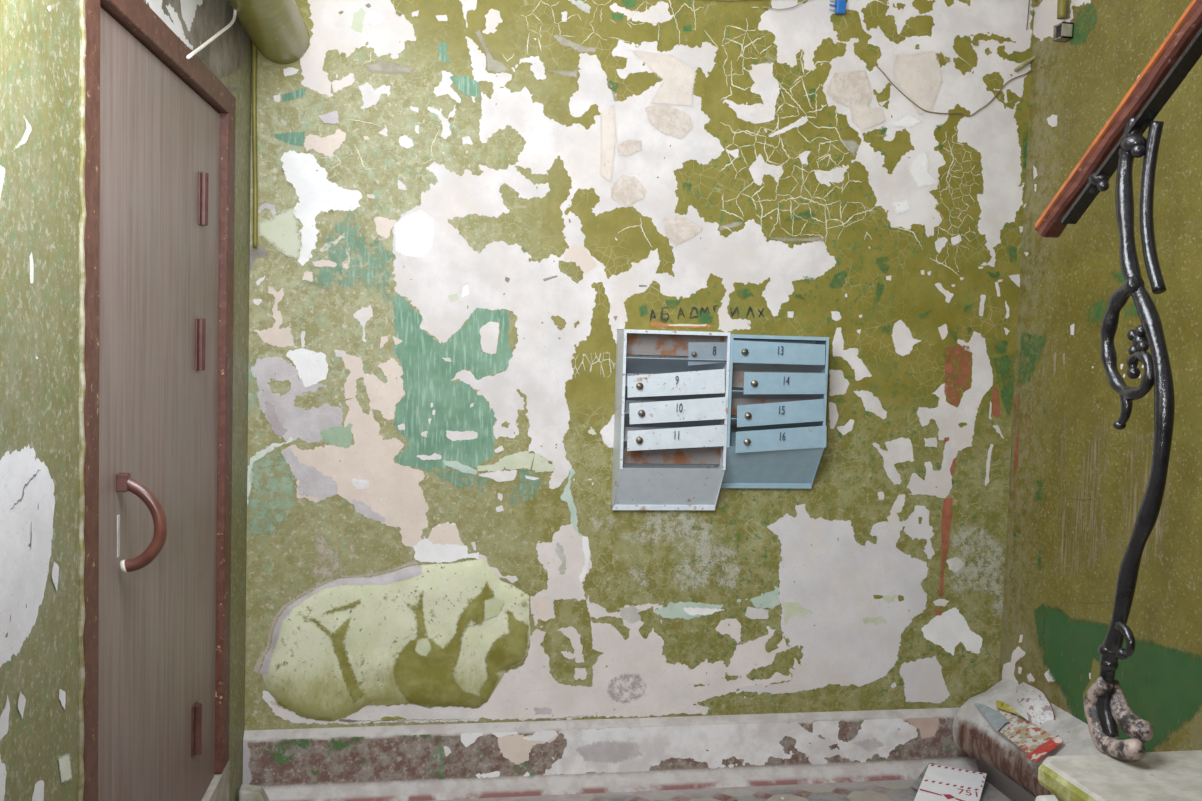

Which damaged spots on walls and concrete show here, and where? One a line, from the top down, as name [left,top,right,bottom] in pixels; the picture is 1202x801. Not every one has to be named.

crack [502,0,981,276]
peeling [722,0,1097,335]
peeling [247,0,836,583]
corrosion [943,345,971,407]
crack [10,469,40,542]
spalling [0,445,59,667]
peeling [262,311,1006,776]
corrosion [935,497,953,616]
peeling [0,691,26,740]
peeling [32,780,44,801]
peeling [58,753,72,783]
peeling [1002,635,1054,684]